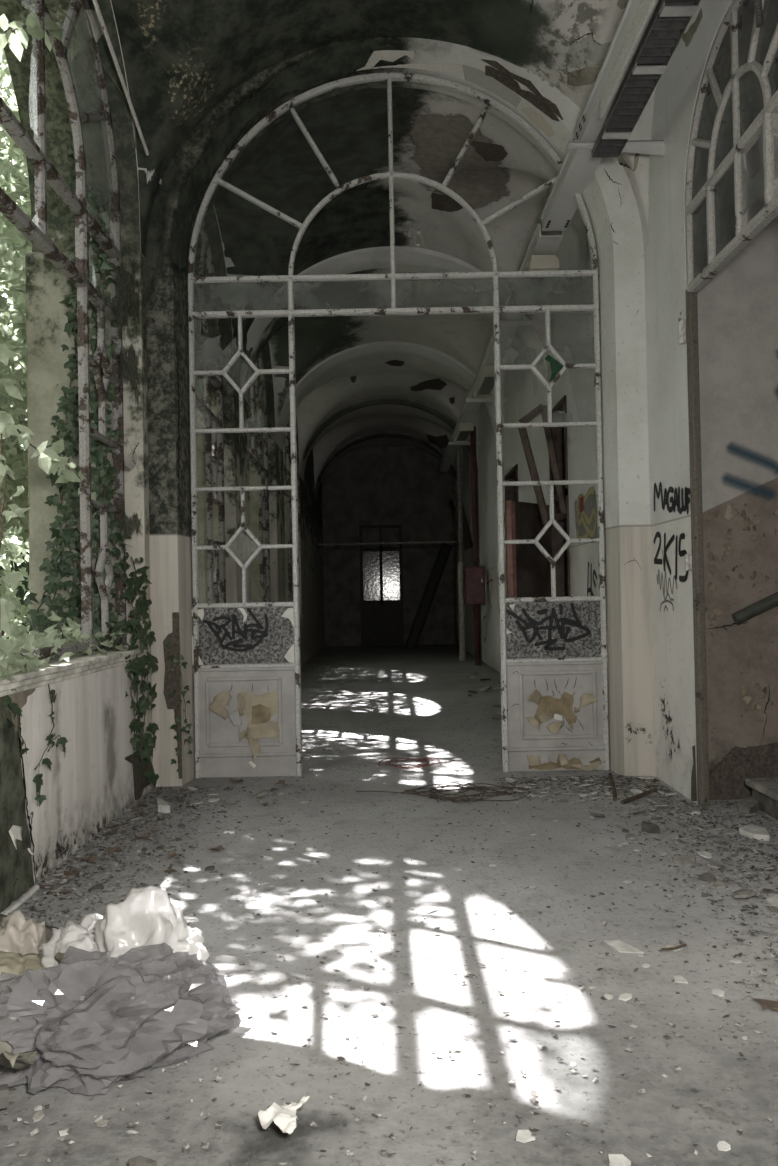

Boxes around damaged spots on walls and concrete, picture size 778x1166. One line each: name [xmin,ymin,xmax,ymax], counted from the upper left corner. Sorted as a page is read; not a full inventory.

peeling [356,50,563,122]
peeling [566,33,611,86]
peeling [408,113,510,212]
damp [111,0,550,413]
spalling [410,378,455,404]
peeling [208,684,280,768]
peeling [525,677,598,735]